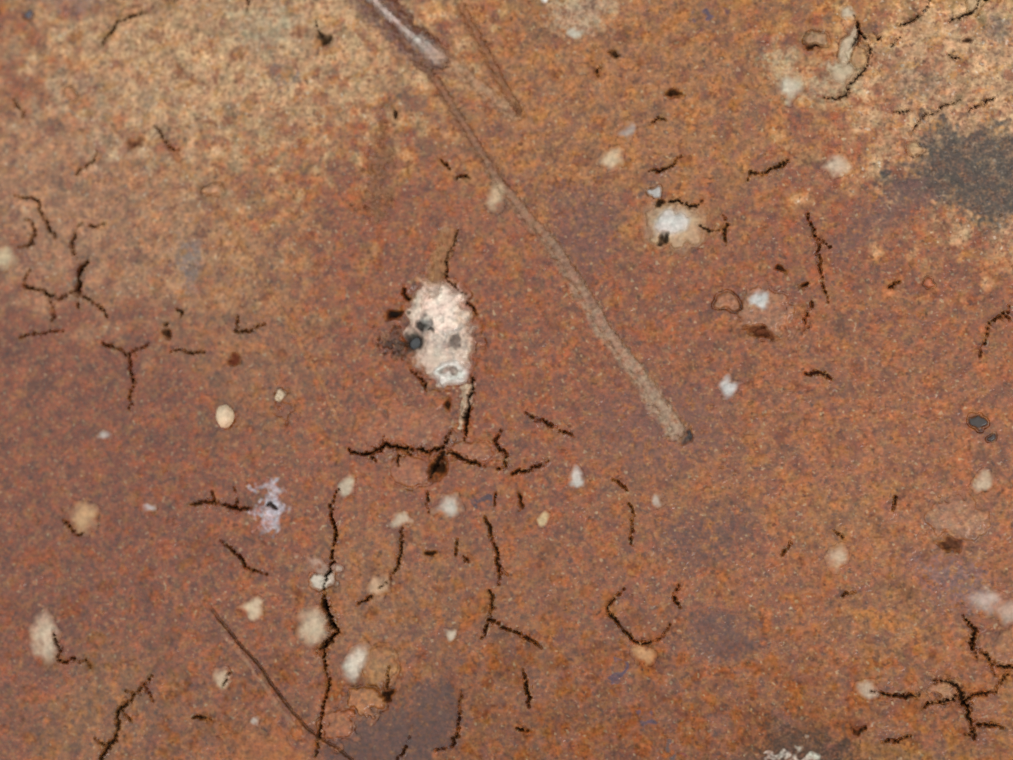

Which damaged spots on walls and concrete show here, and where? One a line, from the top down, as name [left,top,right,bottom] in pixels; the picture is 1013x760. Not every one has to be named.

crack [12,194,205,412]
crack [346,376,550,514]
crack [523,411,575,438]
crack [189,487,252,511]
crack [611,478,635,546]
crack [219,539,268,576]
crack [313,488,341,758]
crack [356,526,404,607]
crack [479,515,542,649]
crack [606,584,682,646]
crack [515,668,533,733]
crack [870,615,1013,742]